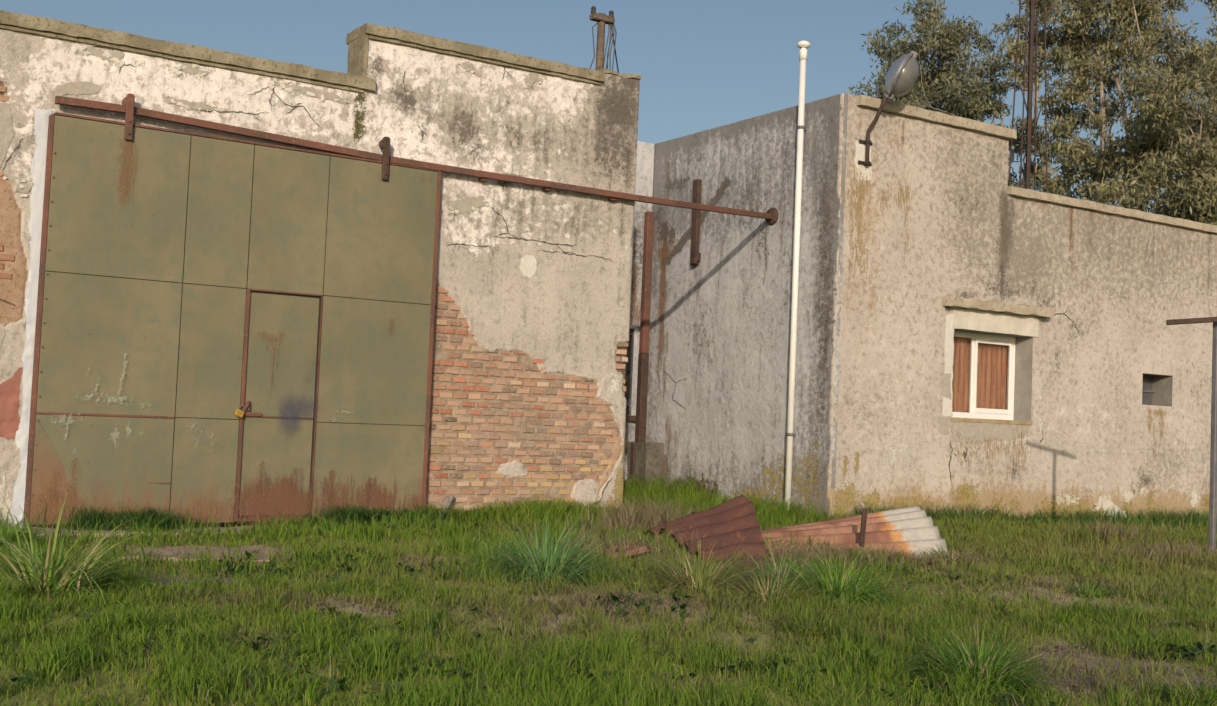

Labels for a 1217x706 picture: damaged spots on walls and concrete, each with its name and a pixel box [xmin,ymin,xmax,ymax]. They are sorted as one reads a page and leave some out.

peeling [81,43,125,67]
peeling [162,92,217,112]
peeling [173,61,208,79]
damp [353,93,369,144]
damp [453,110,481,158]
damp [594,76,640,186]
spalling [0,171,34,326]
corrosion [658,224,678,366]
damp [632,177,731,270]
spalling [425,281,628,514]
corrosion [320,470,423,515]
damp [1094,408,1169,506]